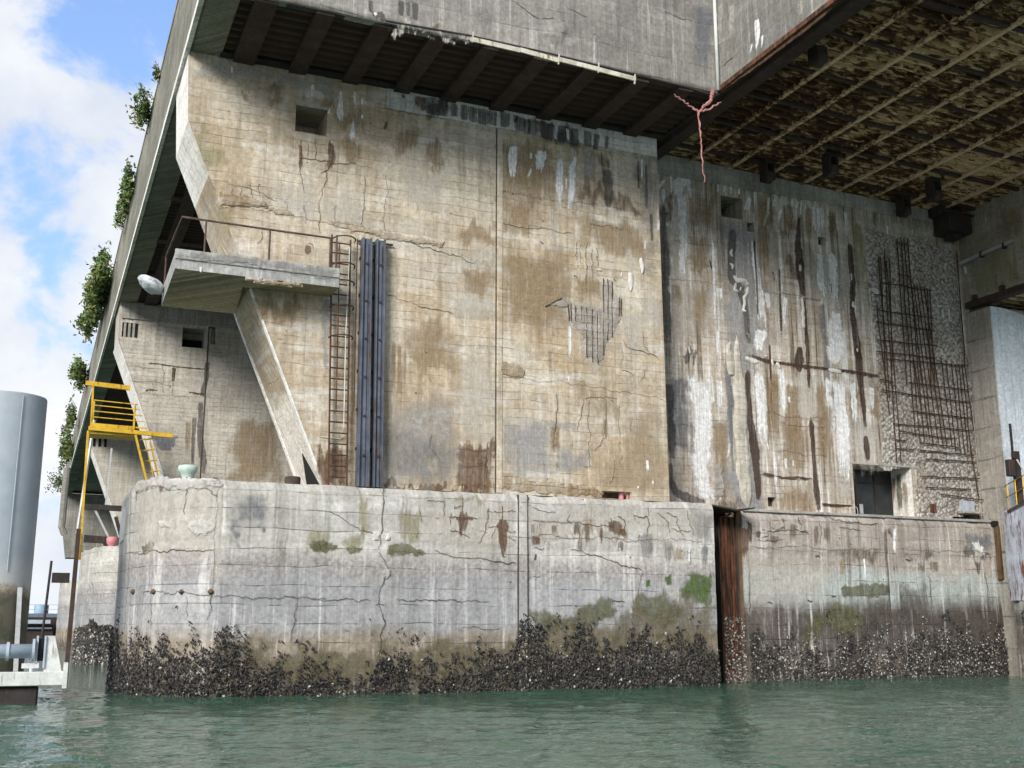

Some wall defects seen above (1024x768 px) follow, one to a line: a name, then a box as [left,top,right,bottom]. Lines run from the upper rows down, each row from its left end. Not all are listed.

crack [191,139,389,279]
damp [392,325,450,382]
spalling [545,278,622,369]
damp [437,100,932,511]
spalling [864,229,984,518]
crack [124,477,499,661]
corrosion [456,512,473,533]
corrosion [497,519,509,557]
crack [416,337,700,602]
corrosion [574,520,625,550]
damp [840,528,896,645]
damp [967,535,990,557]